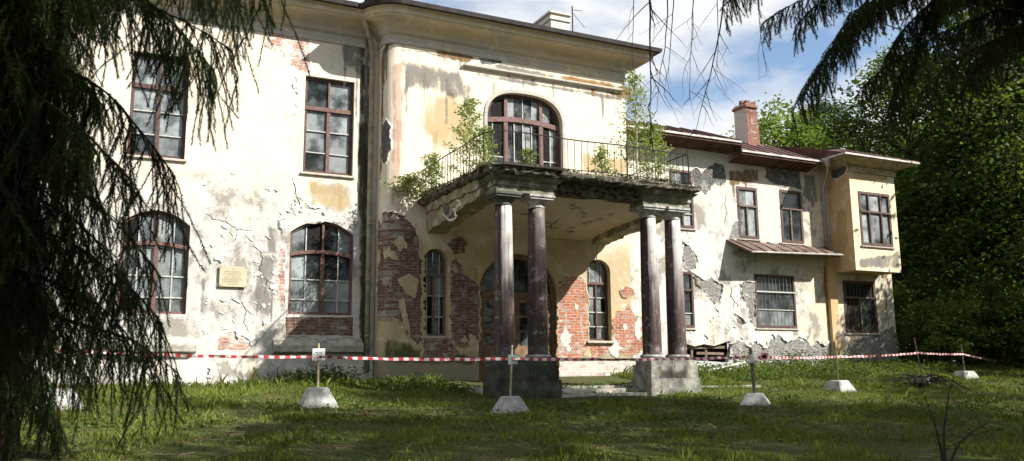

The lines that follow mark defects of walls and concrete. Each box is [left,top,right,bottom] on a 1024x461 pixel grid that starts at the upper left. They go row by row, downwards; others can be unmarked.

flaking render [264,29,312,74]
water stain [312,38,392,356]
spalling [380,117,393,165]
water stain [405,50,473,145]
spalling [440,199,461,222]
spalling [689,161,727,195]
crack [207,214,274,330]
flaking render [194,198,354,353]
flaking render [375,208,482,362]
flaking render [556,274,643,377]
spalling [681,241,725,305]
spalling [728,280,832,367]